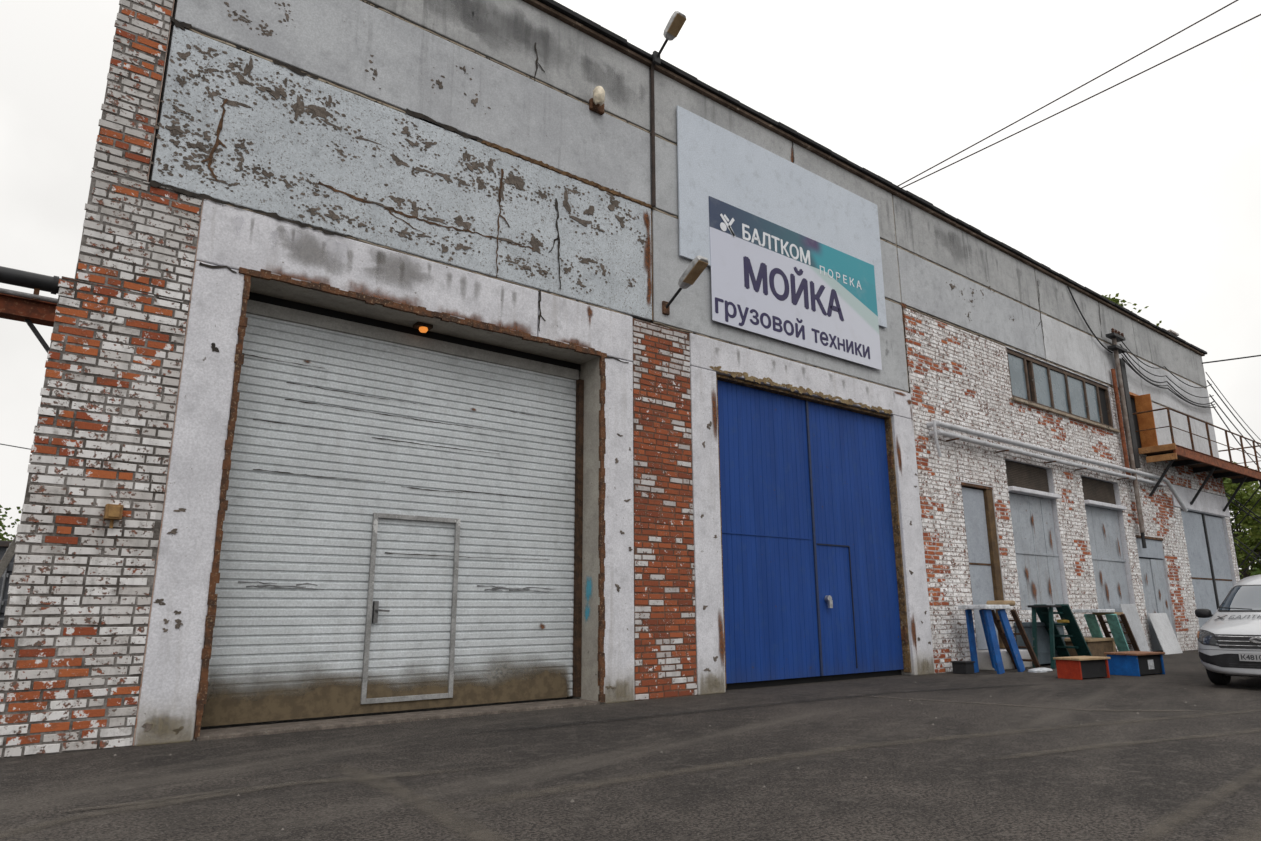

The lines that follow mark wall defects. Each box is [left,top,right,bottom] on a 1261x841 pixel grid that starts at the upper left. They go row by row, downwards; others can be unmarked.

crack [201,98,228,181]
peeling [96,28,648,268]
crack [318,169,561,331]
peeling [489,229,636,293]
flaking render [45,263,174,388]
flaking render [904,315,963,414]
flaking render [31,410,133,480]
flaking render [1009,402,1113,460]
flaking render [615,329,718,698]
flaking render [909,435,951,673]
flaking render [0,627,140,746]
leakage [201,661,568,727]